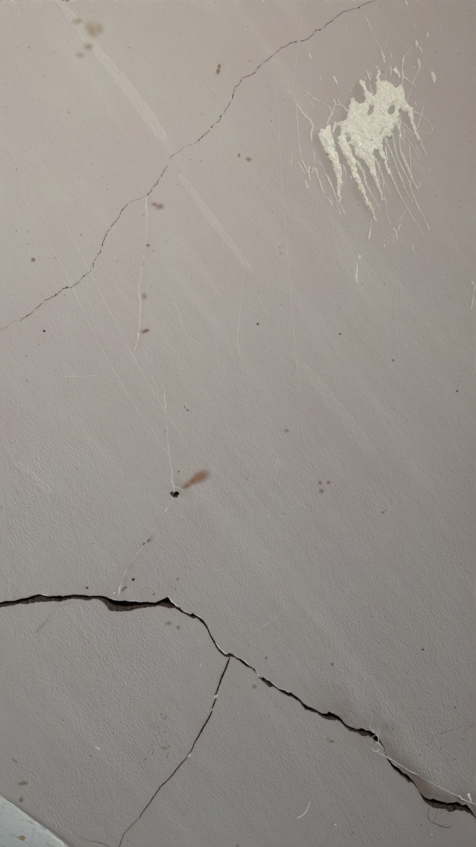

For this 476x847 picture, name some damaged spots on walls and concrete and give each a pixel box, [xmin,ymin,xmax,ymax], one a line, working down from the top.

crack [0,0,376,331]
water stain [280,78,349,216]
water stain [356,107,433,246]
crack [0,594,476,847]